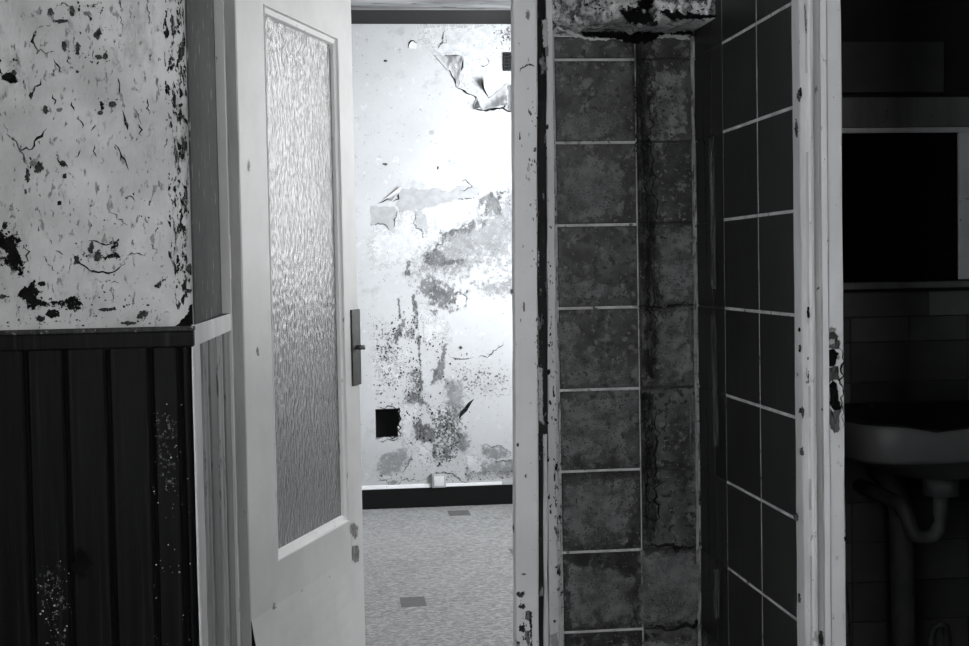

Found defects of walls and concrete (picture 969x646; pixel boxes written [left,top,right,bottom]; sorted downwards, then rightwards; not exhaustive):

spalling [0,58,18,84]
peeling [47,1,110,73]
spalling [493,0,716,87]
spalling [29,154,73,179]
peeling [154,0,193,326]
spalling [0,222,160,327]
leakage [368,189,513,485]
crack [632,41,697,554]
peeling [535,309,563,608]
peeling [515,592,533,646]
crack [652,619,698,632]